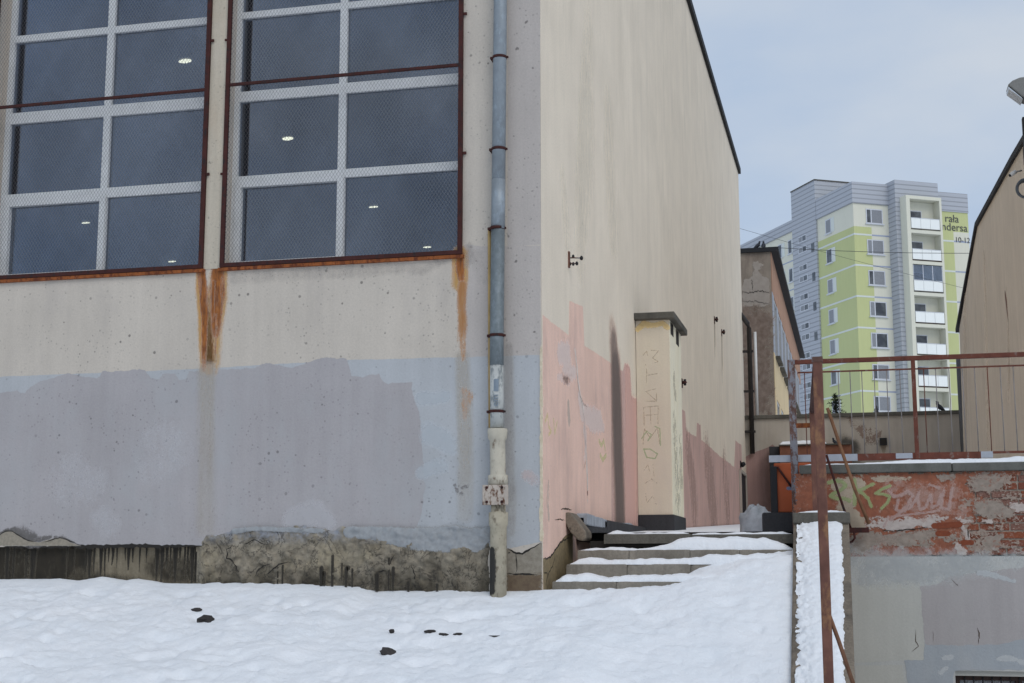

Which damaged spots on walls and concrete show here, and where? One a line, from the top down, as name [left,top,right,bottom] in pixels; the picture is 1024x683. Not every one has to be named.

rust [196,267,227,375]
rust [452,247,468,360]
peeling [792,473,813,513]
peeling [826,471,1024,557]
damp [0,546,197,584]